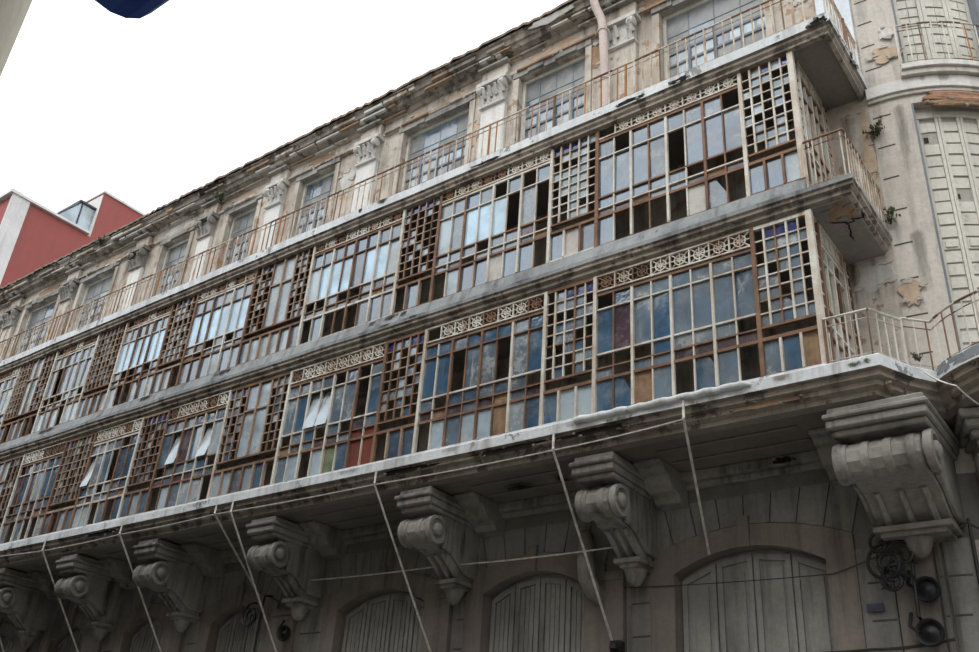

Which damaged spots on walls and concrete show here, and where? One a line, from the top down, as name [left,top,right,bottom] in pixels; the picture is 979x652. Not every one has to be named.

spalling [850,27,904,69]
crack [829,210,864,241]
spalling [854,260,928,306]
peeling [936,344,979,377]